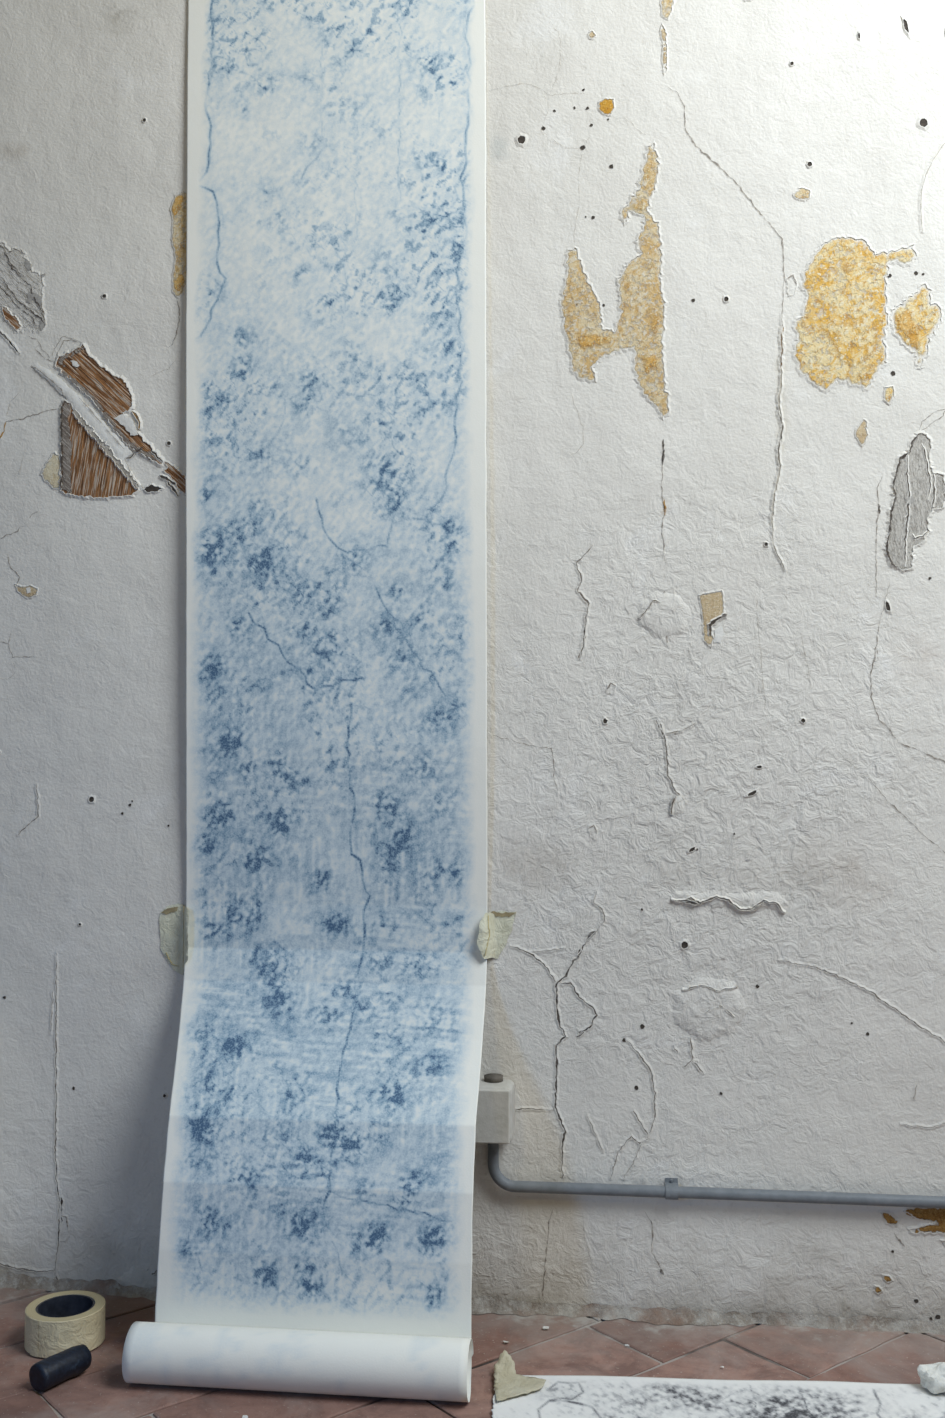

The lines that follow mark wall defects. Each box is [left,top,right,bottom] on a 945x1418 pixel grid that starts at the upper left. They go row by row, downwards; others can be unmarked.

peeling [169,190,187,299]
peeling [558,140,672,421]
crack [668,87,787,572]
peeling [791,234,944,406]
spalling [39,343,186,501]
crack [660,439,668,549]
spalling [882,430,945,580]
peeling [697,589,728,649]
crack [48,952,66,1280]
crack [509,890,706,1181]
crack [777,958,945,1046]
crack [899,1083,945,1131]